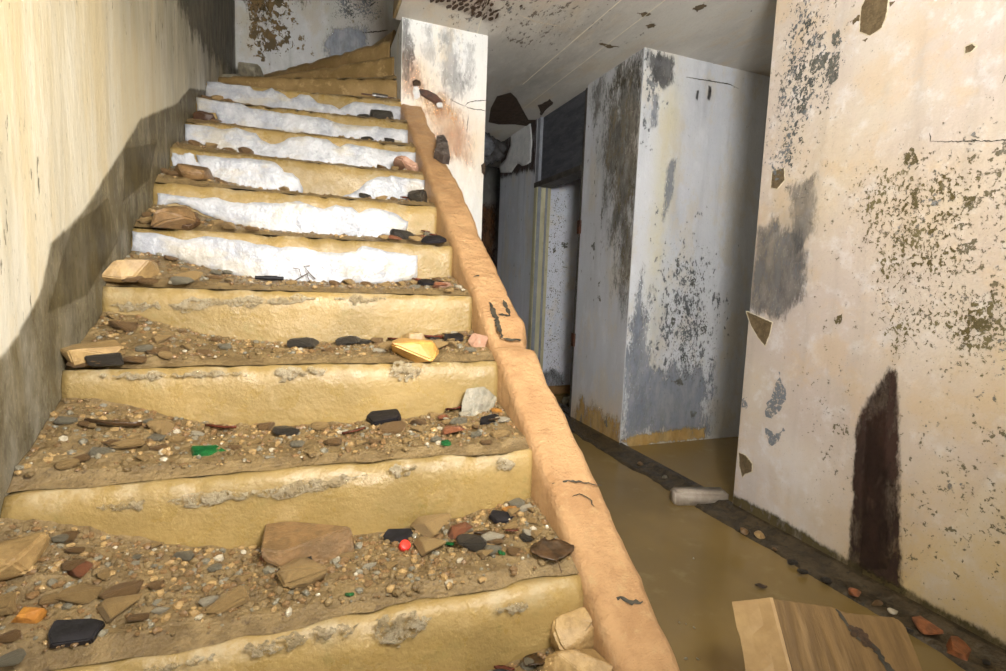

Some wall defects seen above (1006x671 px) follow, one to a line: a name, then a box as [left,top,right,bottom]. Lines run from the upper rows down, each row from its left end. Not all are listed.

water stain [178,0,235,71]
flaking render [131,81,425,305]
water stain [324,27,367,57]
water stain [576,50,714,446]
water stain [750,185,809,318]
peeling [763,0,845,193]
flaking render [852,0,895,42]
water stain [849,371,902,587]